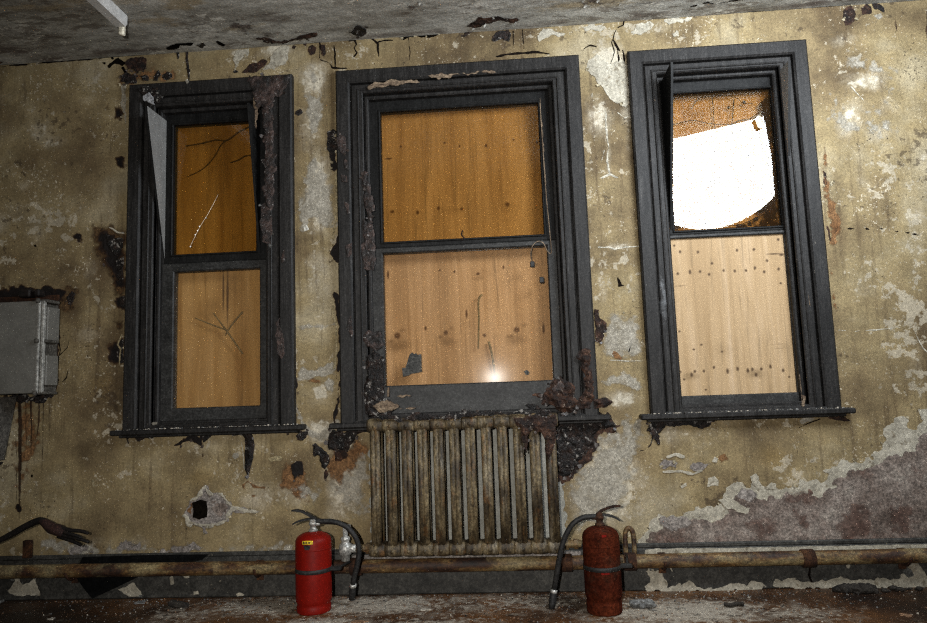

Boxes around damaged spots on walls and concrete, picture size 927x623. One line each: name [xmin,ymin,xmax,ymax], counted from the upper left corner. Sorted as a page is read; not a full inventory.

peeling [349,25,368,39]
peeling [461,16,519,42]
flaking render [586,55,629,108]
water stain [73,225,126,310]
flaking render [638,409,927,554]
flaking render [182,485,259,535]
peeling [645,563,927,591]